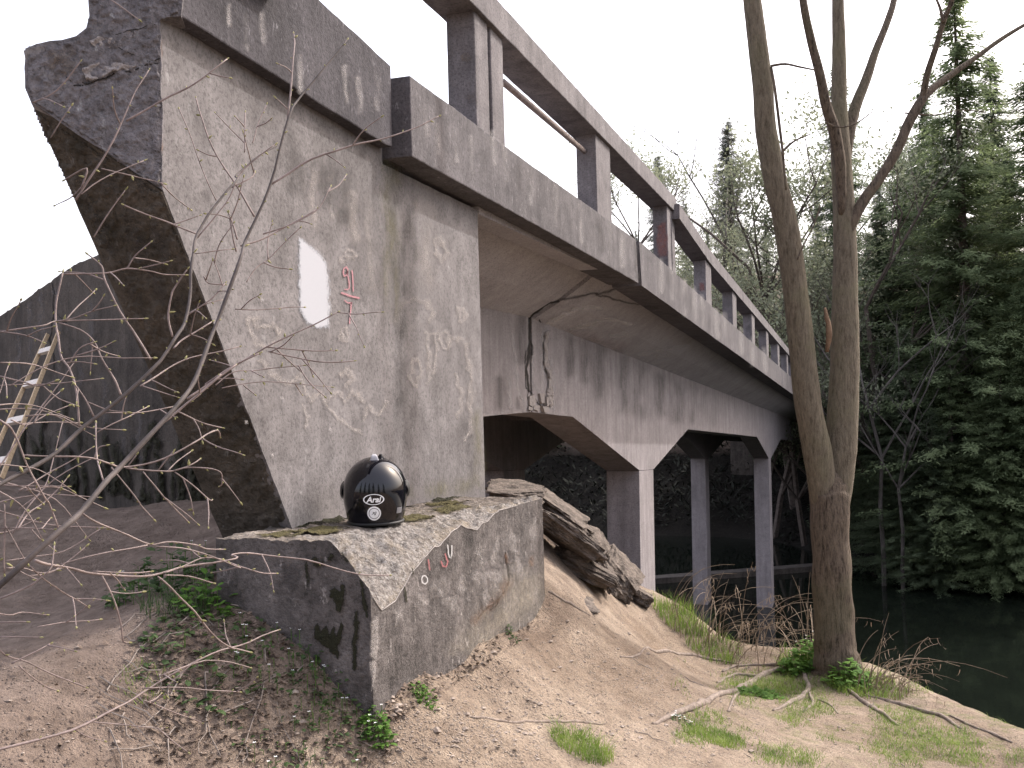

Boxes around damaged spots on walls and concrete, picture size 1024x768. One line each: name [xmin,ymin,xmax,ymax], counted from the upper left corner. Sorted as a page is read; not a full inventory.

crack [525,289,638,406]